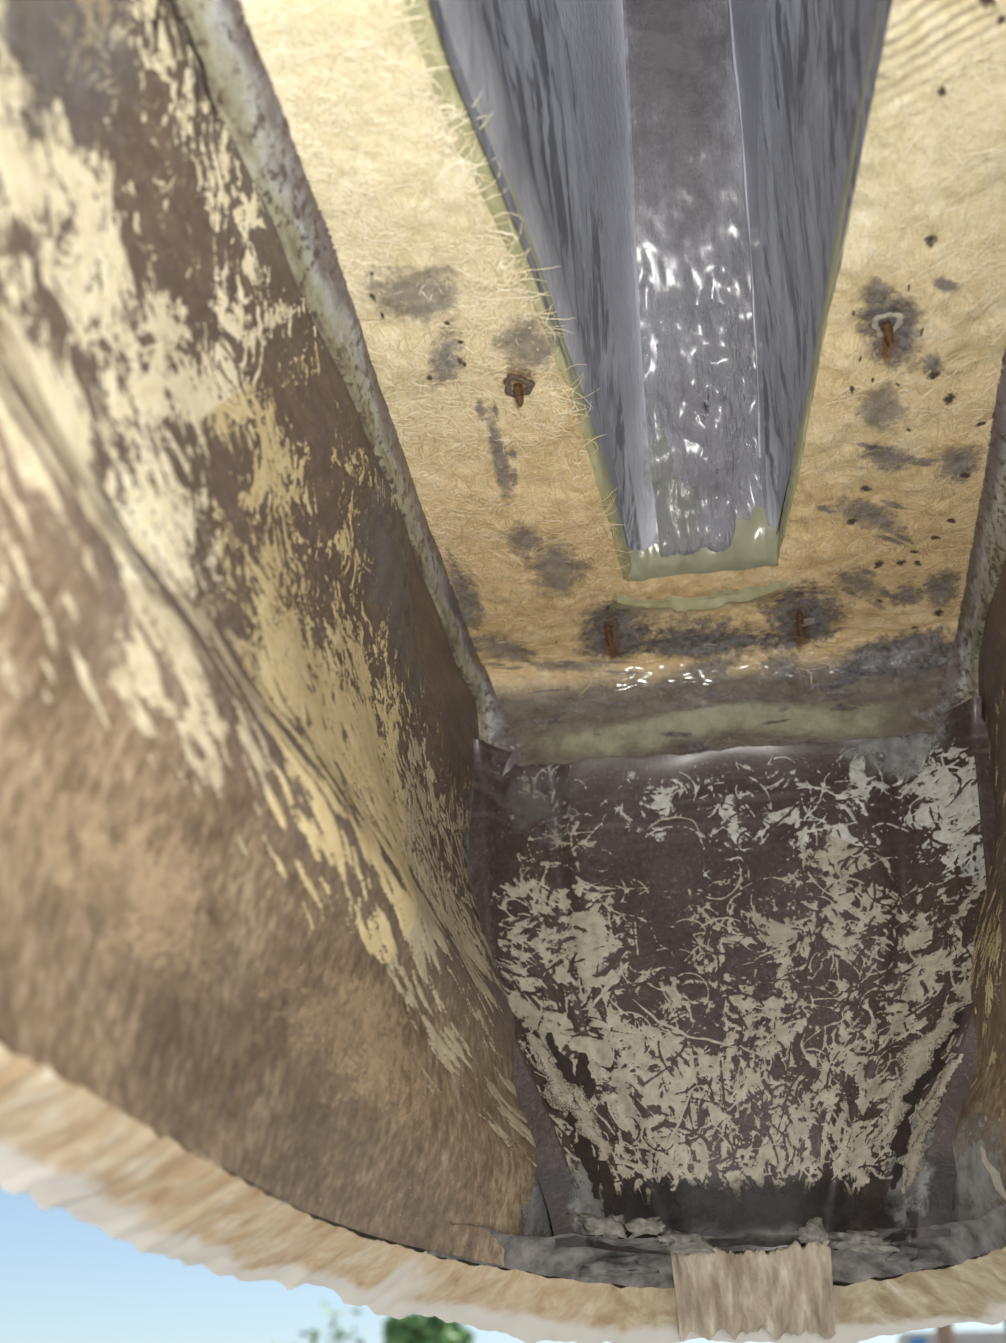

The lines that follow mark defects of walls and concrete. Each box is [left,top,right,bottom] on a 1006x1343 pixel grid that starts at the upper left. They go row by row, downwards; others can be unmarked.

leakage [980,0,1006,24]
leakage [370,269,466,380]
leakage [445,486,960,710]
leakage [666,731,713,754]
peeling [614,802,633,832]
peeling [636,822,680,842]
peeling [494,1066,517,1097]